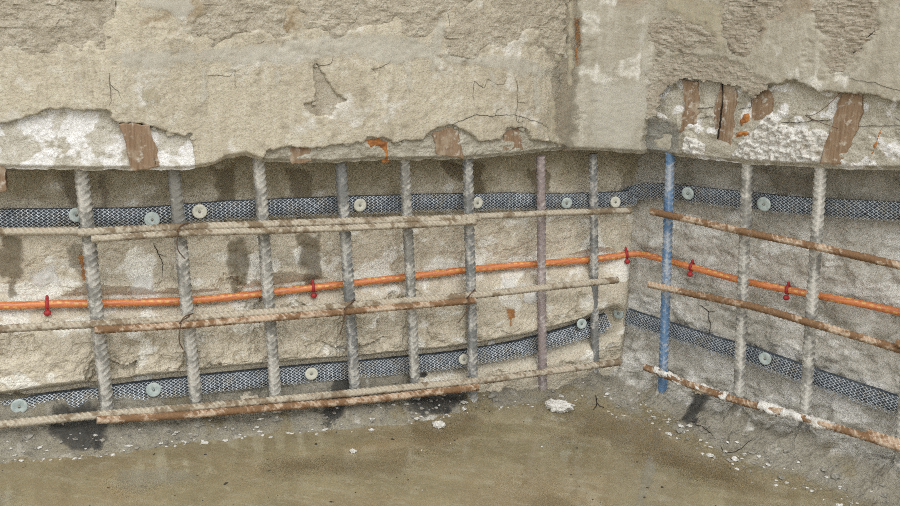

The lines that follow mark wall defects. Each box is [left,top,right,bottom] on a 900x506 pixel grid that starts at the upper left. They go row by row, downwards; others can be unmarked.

spalling [639,0,900,171]
spalling [0,108,130,171]
spalling [137,123,196,170]
corrosion [366,138,390,162]
spalling [262,125,564,163]